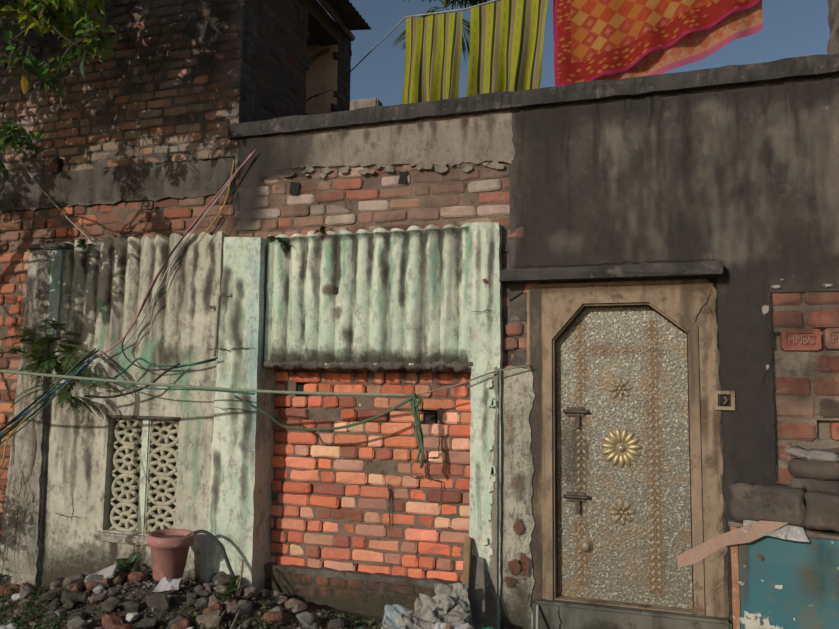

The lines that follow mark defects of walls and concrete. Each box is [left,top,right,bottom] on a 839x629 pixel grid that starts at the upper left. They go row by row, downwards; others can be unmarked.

flaking render [282,161,450,195]
water stain [515,77,839,269]
water stain [70,246,126,315]
water stain [148,242,241,355]
water stain [300,233,358,293]
water stain [367,235,409,306]
water stain [419,230,443,286]
water stain [456,229,493,321]
water stain [270,329,468,389]
water stain [680,228,839,487]
water stain [229,387,250,499]
peeling [483,366,529,628]